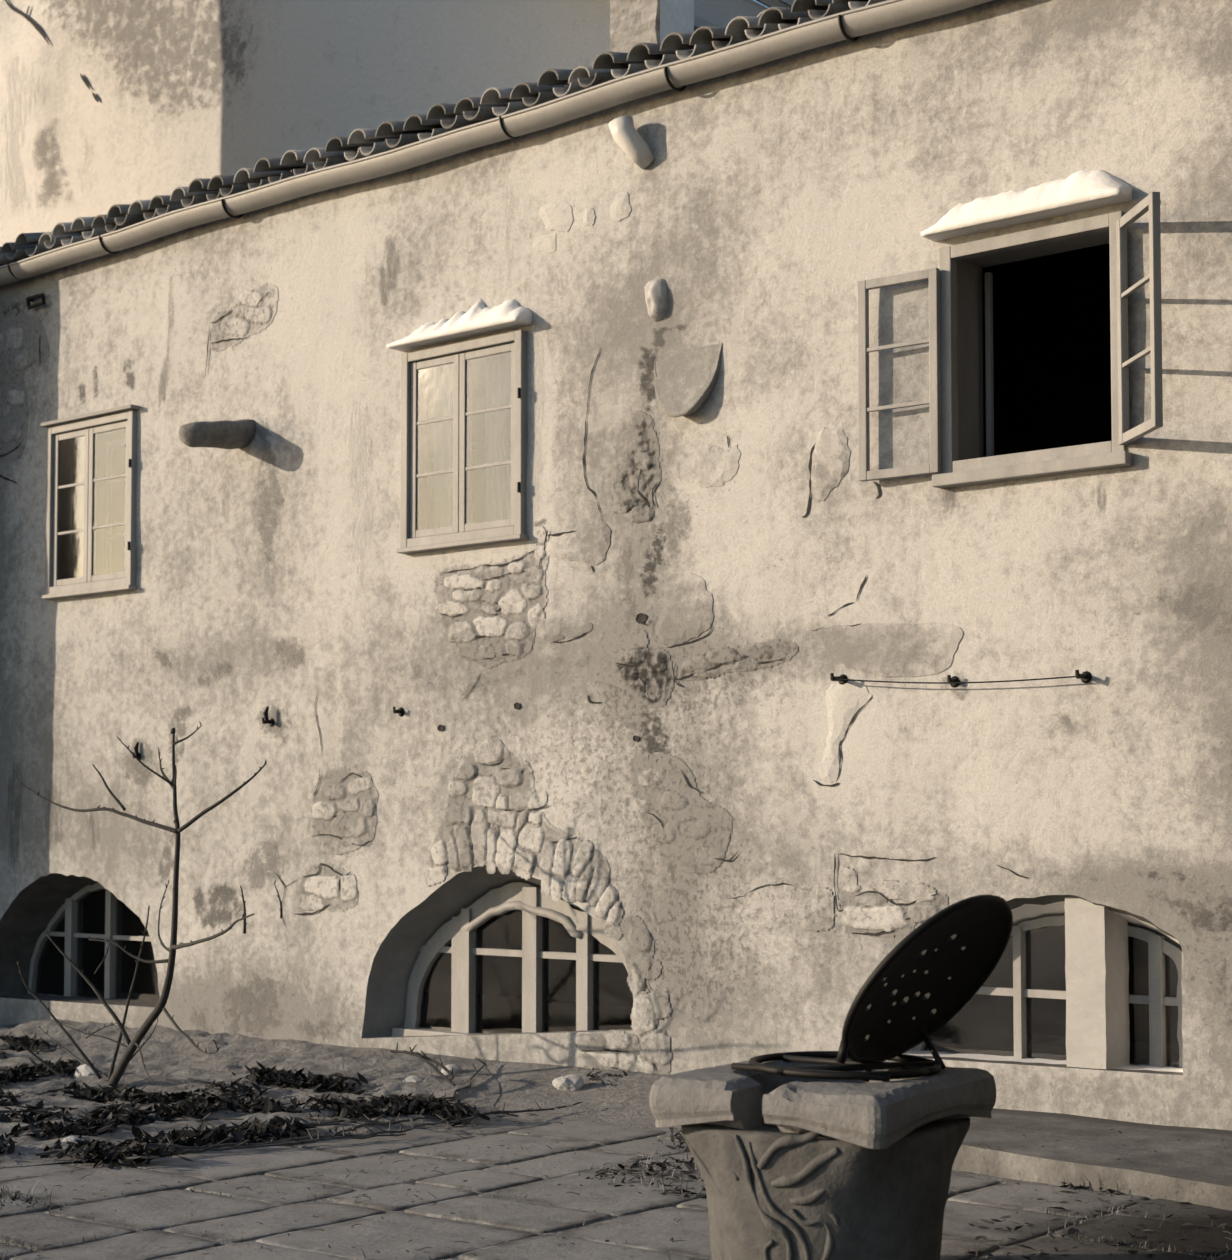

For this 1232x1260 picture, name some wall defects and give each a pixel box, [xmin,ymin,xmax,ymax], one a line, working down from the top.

flaking render [205,283,278,377]
damp [639,325,684,411]
flaking render [432,410,741,669]
crack [582,349,603,523]
damp [641,529,665,597]
flaking render [802,426,851,518]
damp [640,713,667,766]
flaking render [616,573,798,708]
flaking render [812,622,964,787]
flaking render [297,767,378,915]
flaking render [425,739,672,1075]
flaking render [793,854,950,938]